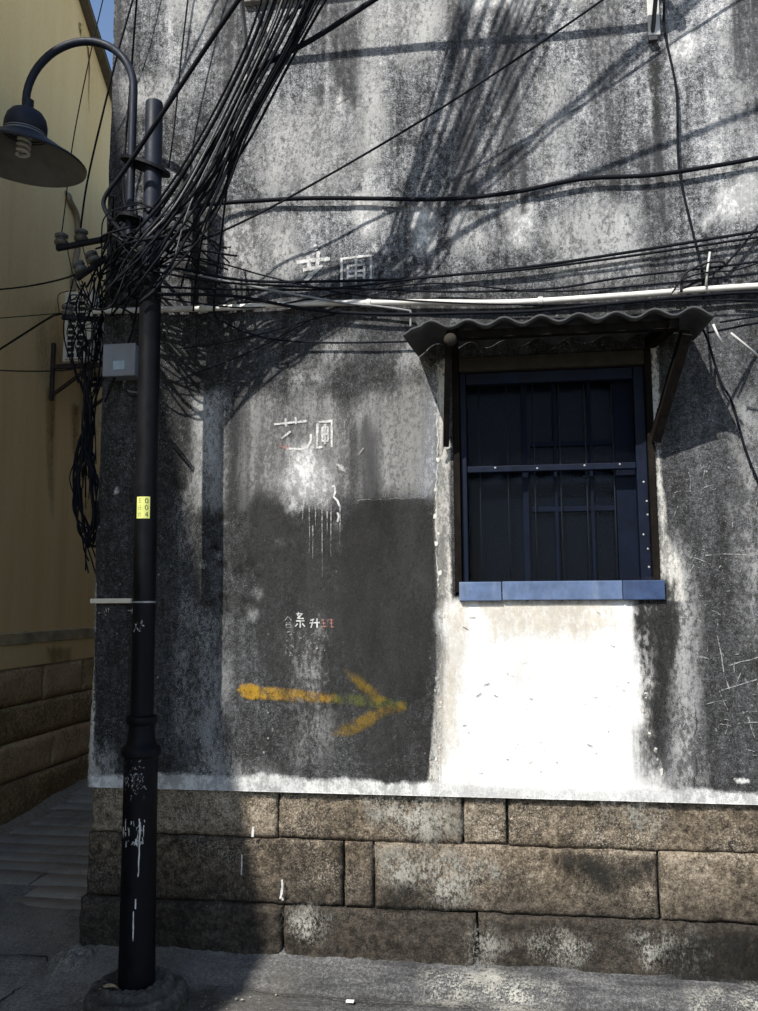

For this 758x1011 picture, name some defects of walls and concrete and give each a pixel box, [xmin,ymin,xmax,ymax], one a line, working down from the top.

water stain [256,0,476,202]
water stain [495,4,572,212]
water stain [713,0,758,144]